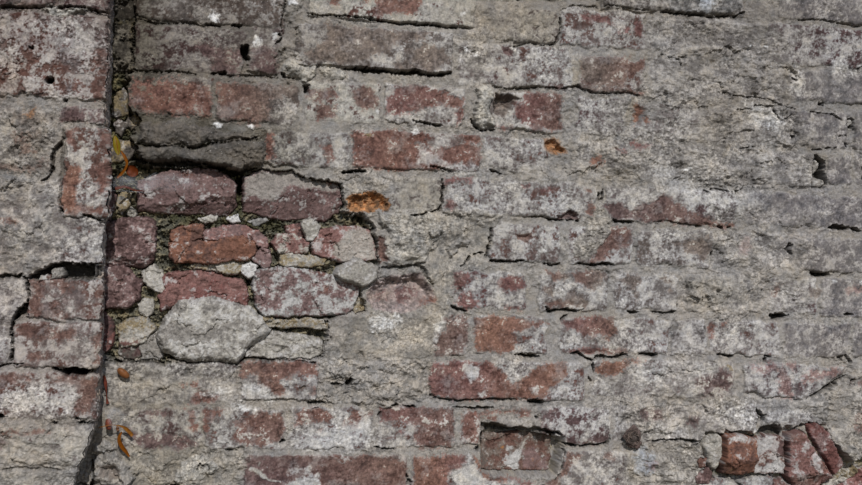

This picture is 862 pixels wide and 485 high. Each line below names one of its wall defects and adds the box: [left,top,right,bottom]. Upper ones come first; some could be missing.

crack [410,178,445,217]
spalling [55,0,737,485]
crack [460,227,494,267]
peeling [0,279,100,418]
peeling [0,423,56,452]
spalling [684,413,862,485]